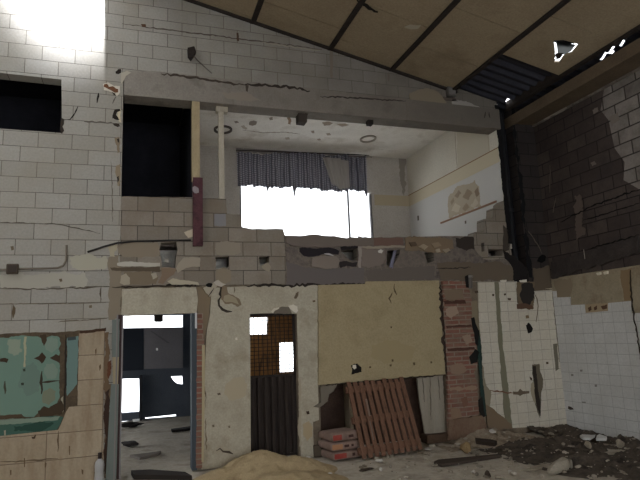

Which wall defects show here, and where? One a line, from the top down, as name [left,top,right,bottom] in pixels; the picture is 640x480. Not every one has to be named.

crack [122,23,322,51]
spalling [103,69,131,96]
crack [162,73,402,101]
peeling [448,180,481,218]
crack [561,189,640,222]
crack [0,222,100,234]
flaking render [168,257,241,336]
spalling [271,234,475,314]
flaking render [516,265,553,310]
peeling [444,280,543,430]
peeling [0,328,111,439]